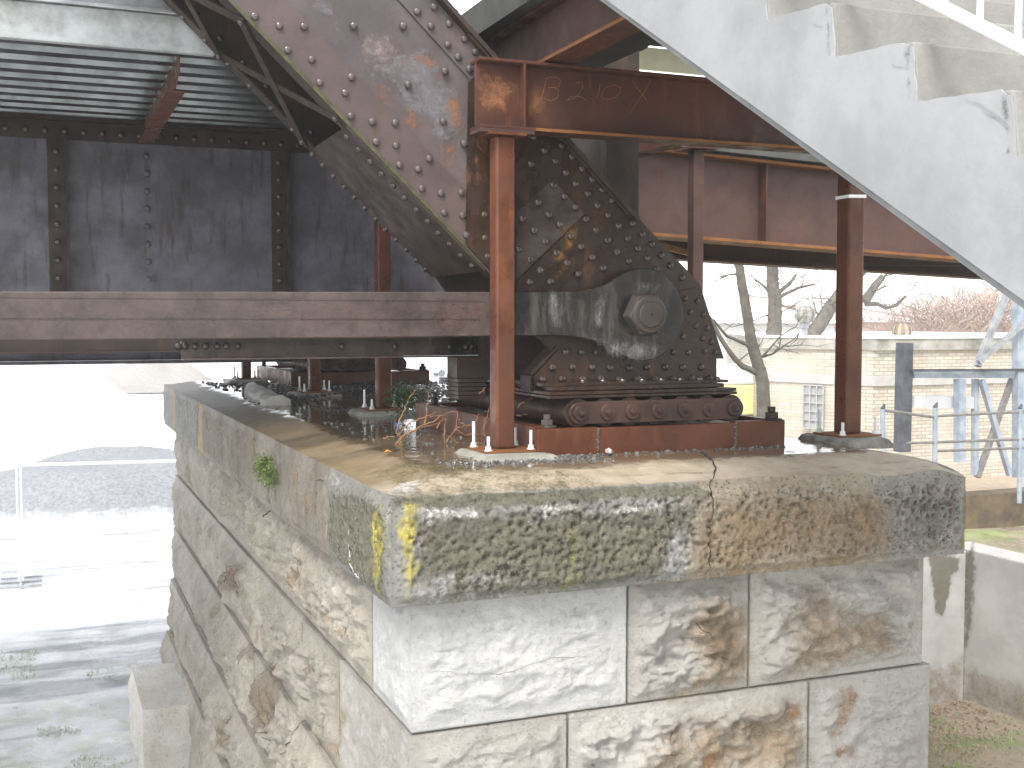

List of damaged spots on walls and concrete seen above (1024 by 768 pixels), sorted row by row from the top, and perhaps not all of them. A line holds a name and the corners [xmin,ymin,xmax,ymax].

corrosion [479,74,512,110]
crack [701,452,717,579]
water stain [929,538,975,646]